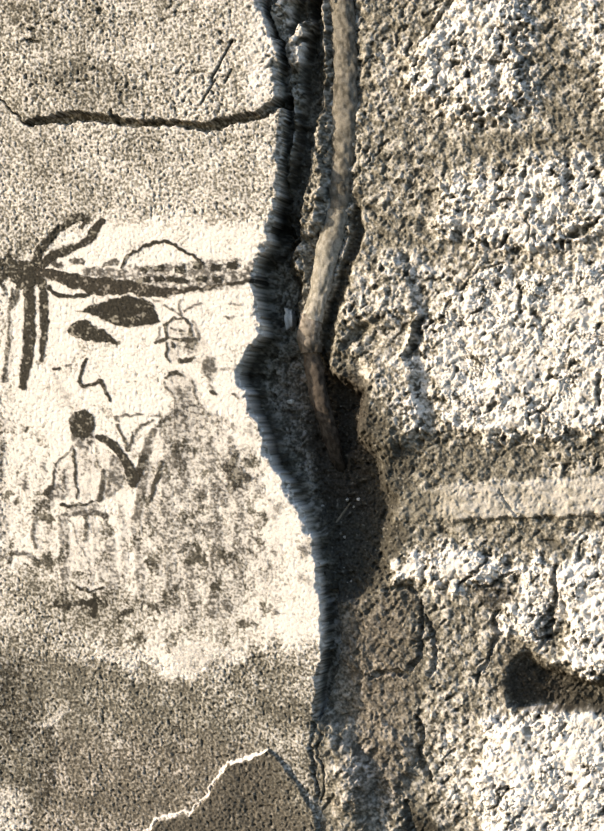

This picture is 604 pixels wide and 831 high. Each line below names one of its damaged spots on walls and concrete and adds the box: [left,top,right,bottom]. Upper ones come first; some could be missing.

crack [0,0,399,801]
spalling [144,749,317,831]